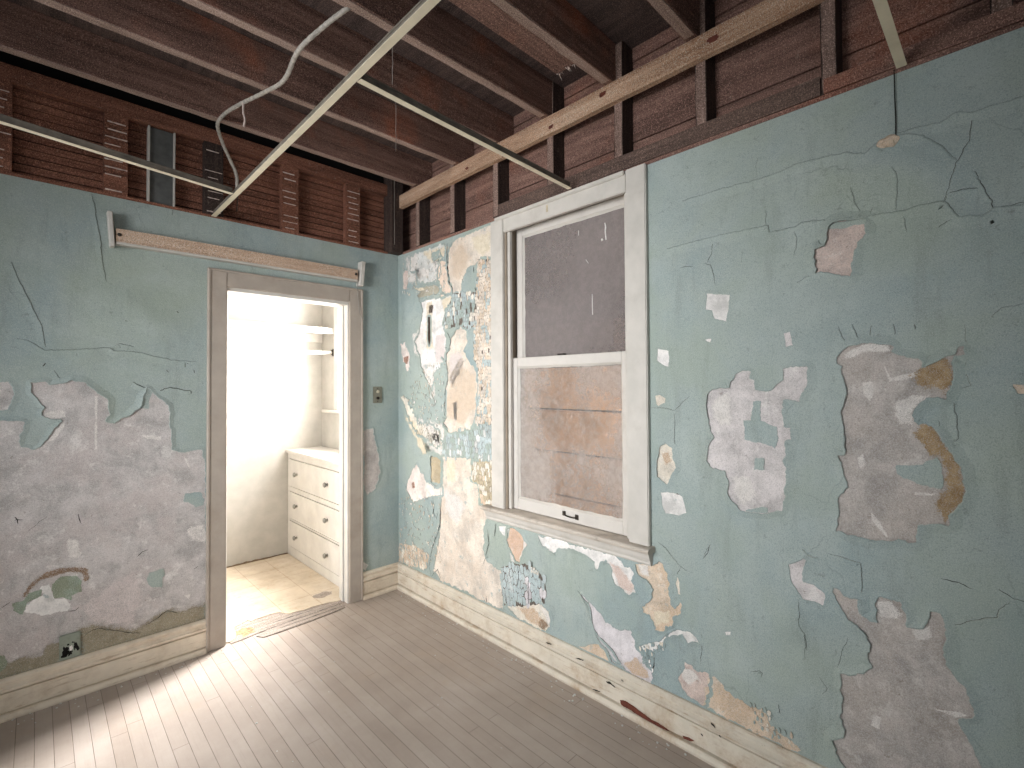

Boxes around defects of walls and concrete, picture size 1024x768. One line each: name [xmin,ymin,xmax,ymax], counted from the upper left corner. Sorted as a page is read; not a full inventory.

crack [86,193,107,282]
peeling [803,210,877,287]
crack [4,262,60,379]
crack [131,363,195,409]
peeling [363,426,383,496]
peeling [399,221,704,692]
peeling [699,327,980,551]
peeling [0,375,206,666]
peeling [783,551,995,768]